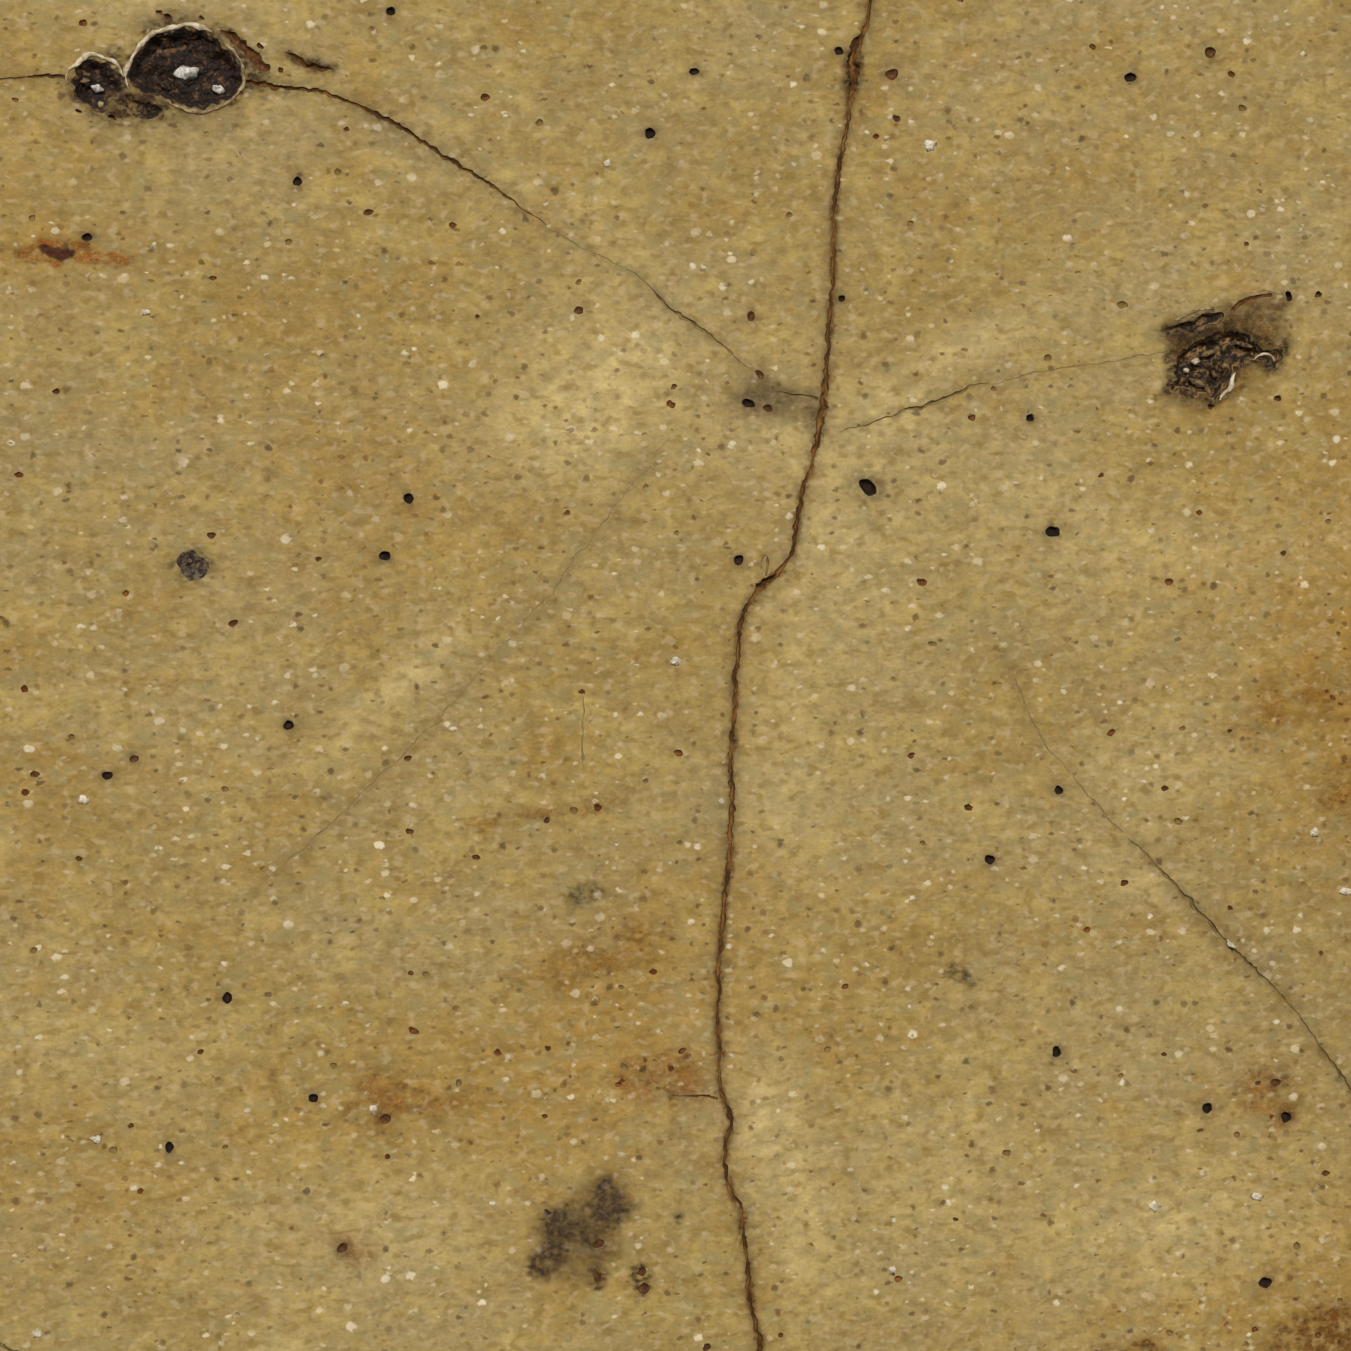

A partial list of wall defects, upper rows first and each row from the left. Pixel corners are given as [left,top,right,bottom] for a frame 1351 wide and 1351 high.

crack [0,72,66,80]
spalling [65,10,284,120]
rust [15,240,126,267]
spalling [1161,289,1292,410]
crack [246,0,1169,1351]
crack [1004,655,1351,1090]
damp [528,1178,630,1290]